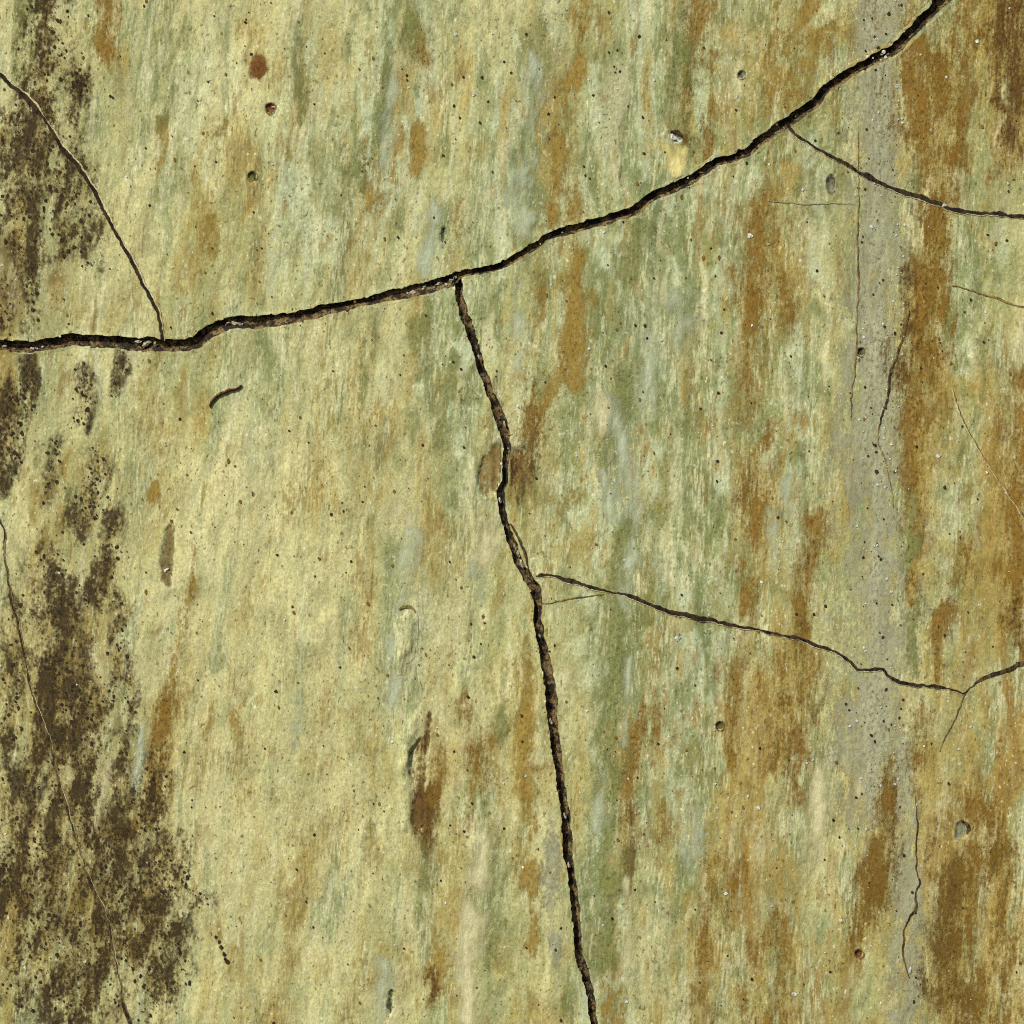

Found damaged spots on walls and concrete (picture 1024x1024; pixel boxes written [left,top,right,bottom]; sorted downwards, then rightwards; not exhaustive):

mould [0,0,111,335]
rust [732,182,798,424]
crack [854,176,862,312]
crack [877,310,910,508]
rust [884,0,1024,608]
crack [0,519,133,1024]
mould [0,350,215,1024]
rust [735,508,826,812]
rust [849,759,903,962]
crack [902,796,921,978]
rust [918,775,1022,1024]
crack [964,661,1024,694]